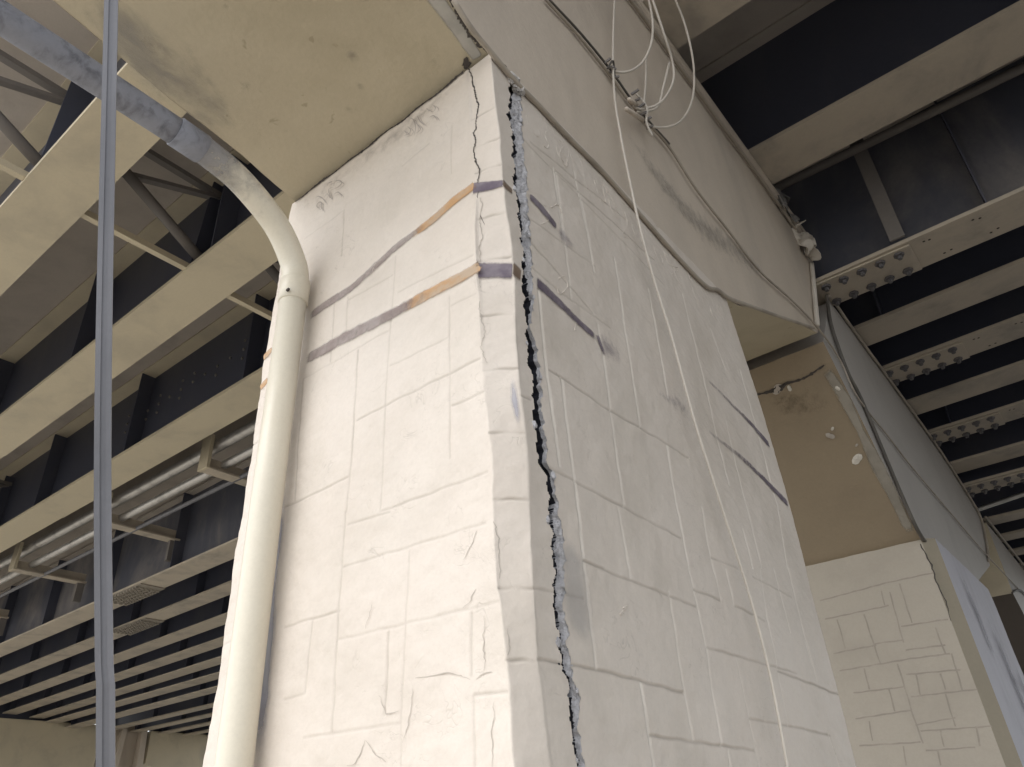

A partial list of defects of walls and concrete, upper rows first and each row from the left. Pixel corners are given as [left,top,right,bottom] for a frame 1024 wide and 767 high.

crack [295,0,487,362]
crack [505,65,585,767]
crack [757,365,824,395]